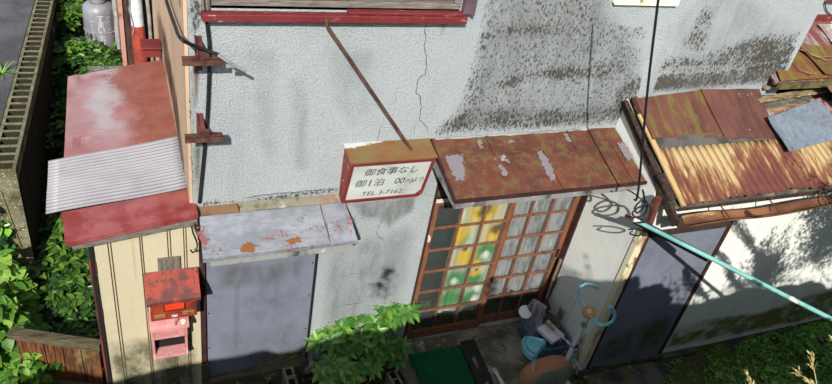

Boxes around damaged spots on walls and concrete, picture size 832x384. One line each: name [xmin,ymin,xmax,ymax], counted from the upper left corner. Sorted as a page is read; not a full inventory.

crack [393,26,428,132]
damp [440,0,646,134]
damp [654,7,800,90]
peeling [443,153,465,181]
peeling [537,150,556,182]
peeling [617,142,632,161]
corrosion [240,242,256,253]
mould [116,344,185,384]